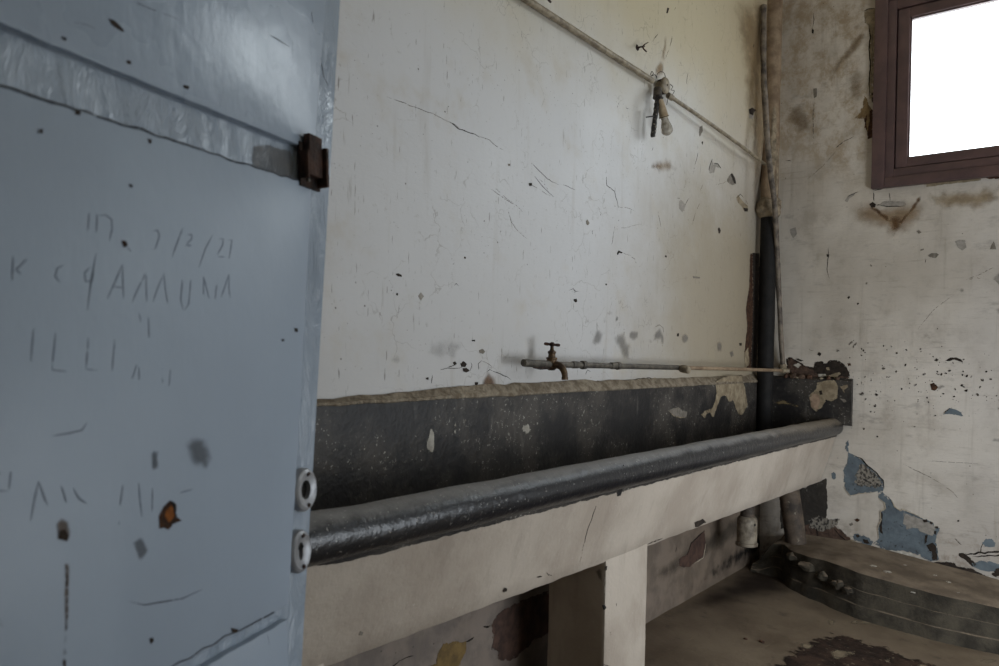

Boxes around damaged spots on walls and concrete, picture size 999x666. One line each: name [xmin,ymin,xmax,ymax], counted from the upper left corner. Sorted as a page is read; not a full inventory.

spalling [855,8,875,139]
crack [388,97,503,150]
water stain [942,194,991,205]
spalling [701,253,759,418]
flaking render [668,407,687,418]
spalling [786,348,881,413]
spalling [882,346,997,416]
peeling [805,441,999,593]
peeling [431,637,474,666]
peeling [484,591,549,661]